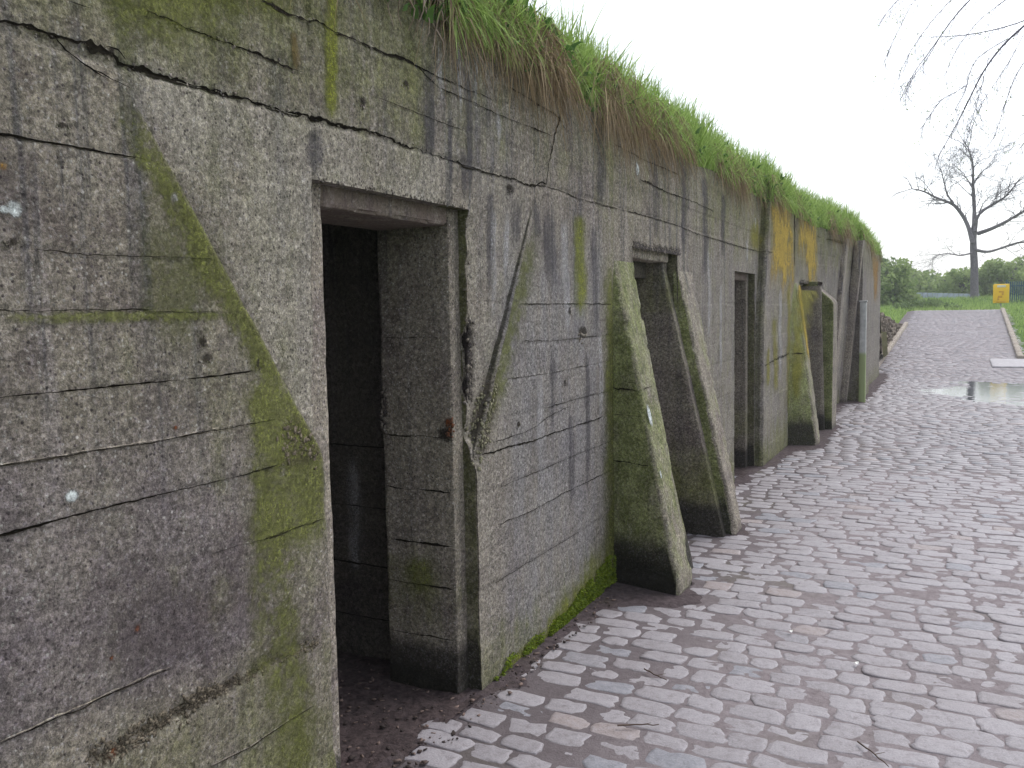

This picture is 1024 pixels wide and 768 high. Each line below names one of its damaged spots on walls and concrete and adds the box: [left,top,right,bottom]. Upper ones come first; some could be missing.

crack [0,0,795,257]
leakage [574,218,586,309]
crack [0,371,251,398]
corrosion [438,417,455,442]
crack [480,381,654,525]
crack [0,464,279,537]